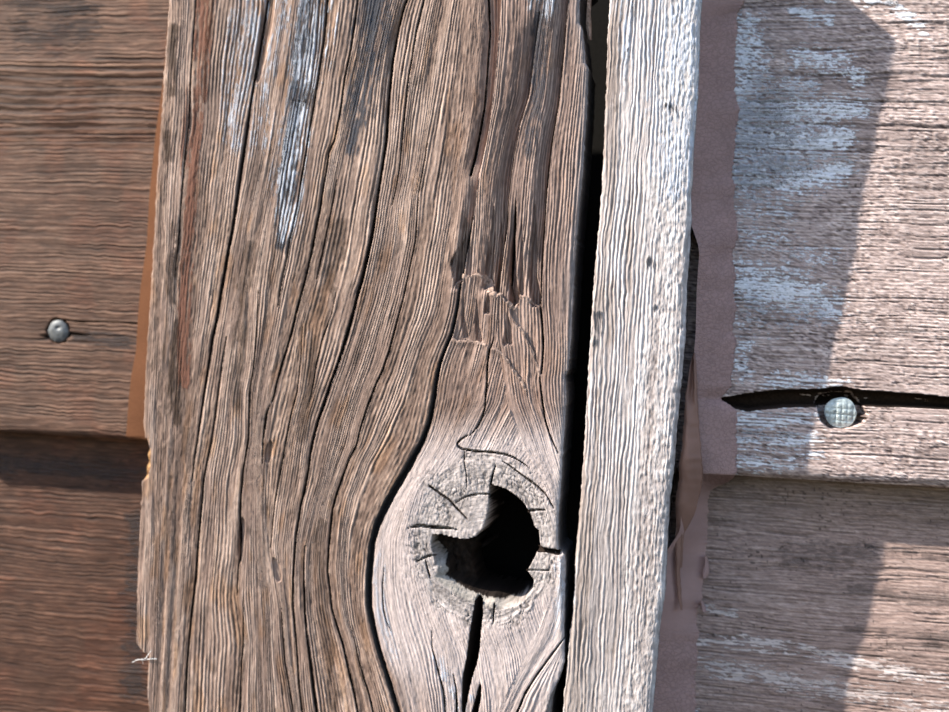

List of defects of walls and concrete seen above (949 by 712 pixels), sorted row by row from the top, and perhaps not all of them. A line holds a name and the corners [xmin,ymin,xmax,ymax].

crack [470,0,491,177]
crack [499,15,540,293]
crack [539,0,569,451]
crack [237,0,473,712]
crack [411,338,554,530]
crack [721,386,949,412]
crack [527,545,561,571]
crack [432,595,495,712]
crack [516,638,565,712]